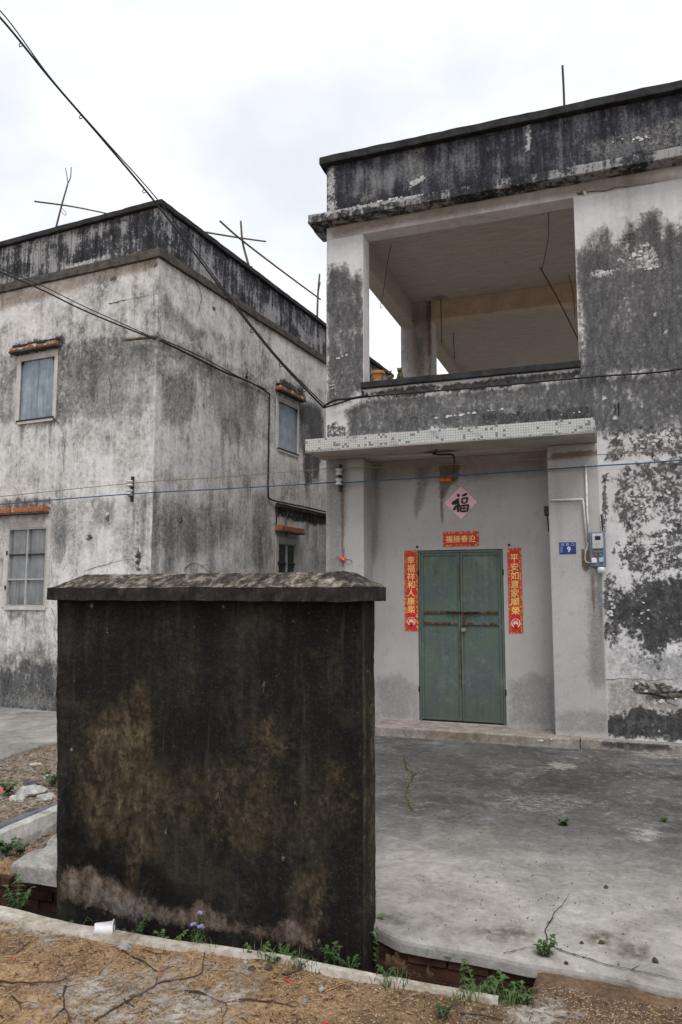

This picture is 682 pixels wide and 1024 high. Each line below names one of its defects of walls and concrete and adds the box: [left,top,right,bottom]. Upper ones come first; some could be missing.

peeling [590,242,661,278]
damp [10,335,65,368]
damp [275,211,682,670]
damp [0,497,50,509]
corrosion [424,565,498,689]
damp [0,658,58,712]
spalling [633,681,682,703]
crack [403,757,418,813]
damp [58,783,202,909]
crack [503,896,682,981]